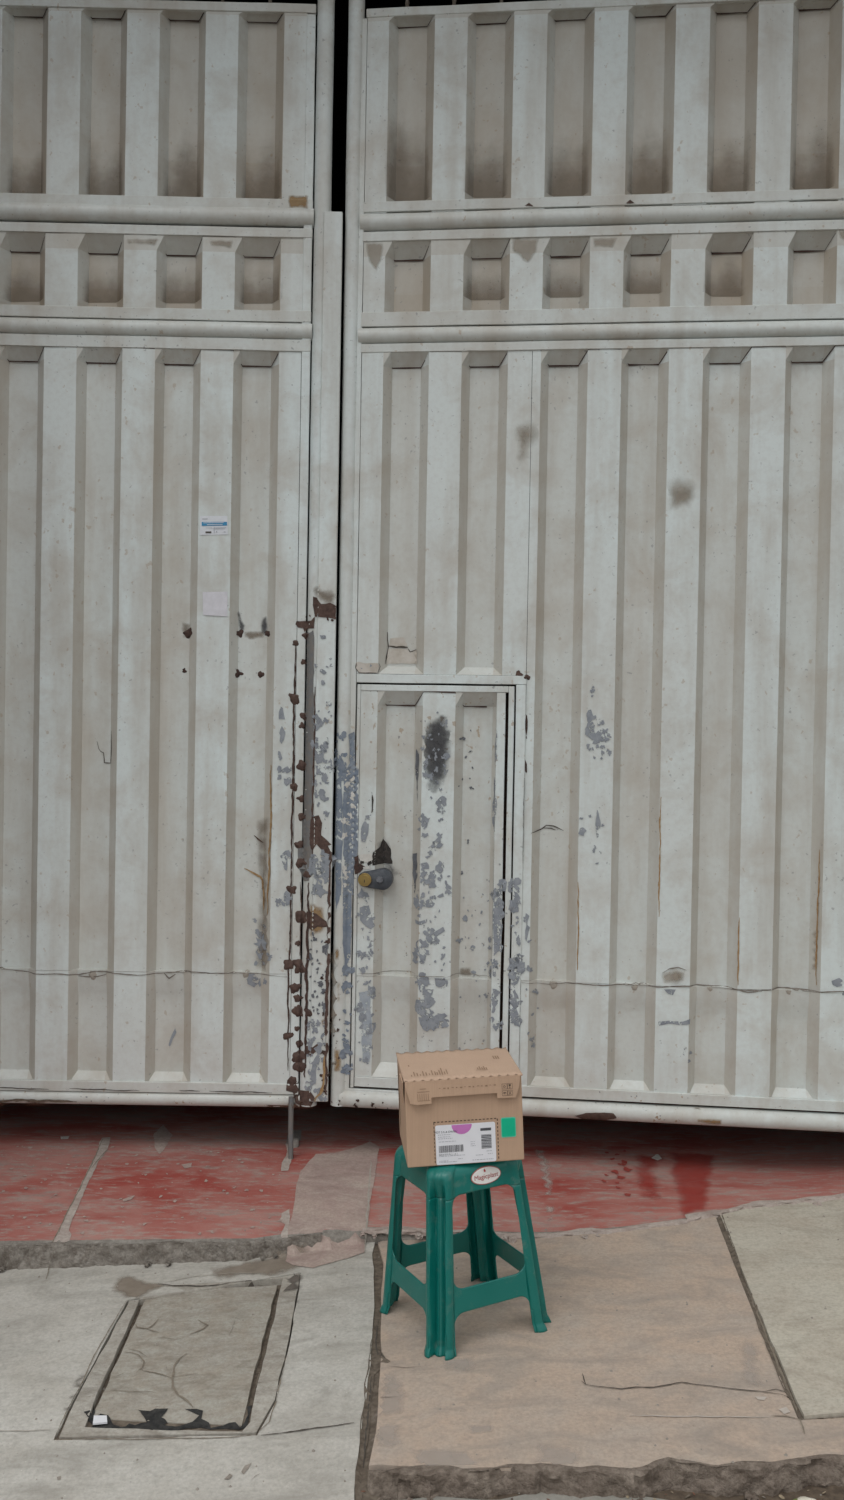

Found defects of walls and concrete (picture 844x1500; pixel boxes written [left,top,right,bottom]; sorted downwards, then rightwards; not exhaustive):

rust [236,614,270,638]
peeling [585,686,612,759]
rust [244,770,272,987]
peeling [275,631,376,1102]
rust [268,590,388,1109]
peeling [412,711,539,1048]
peeling [578,810,604,864]